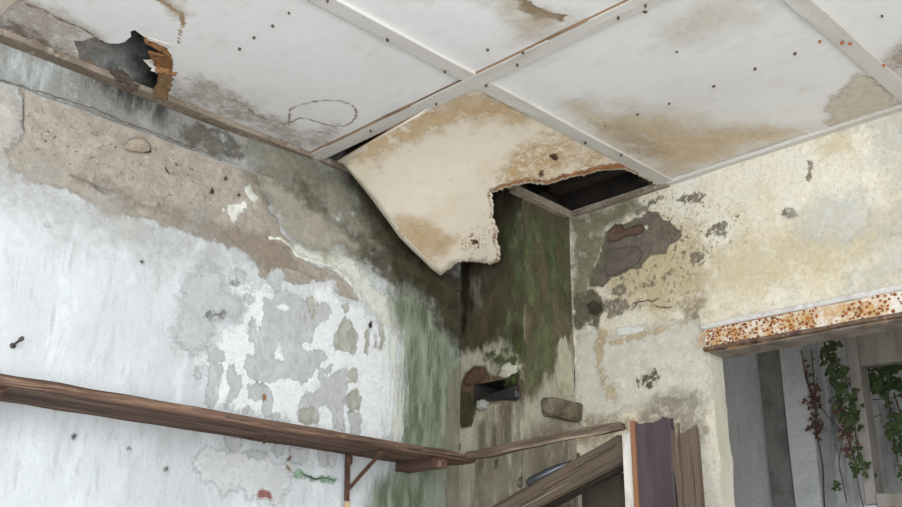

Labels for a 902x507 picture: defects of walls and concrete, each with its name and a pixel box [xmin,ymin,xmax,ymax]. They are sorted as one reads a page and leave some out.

water stain [511,0,567,30]
water stain [601,119,786,172]
peeling [0,81,407,439]
water stain [180,82,608,452]
peeling [589,192,741,318]
corrosion [700,292,902,352]
water stain [473,404,580,507]